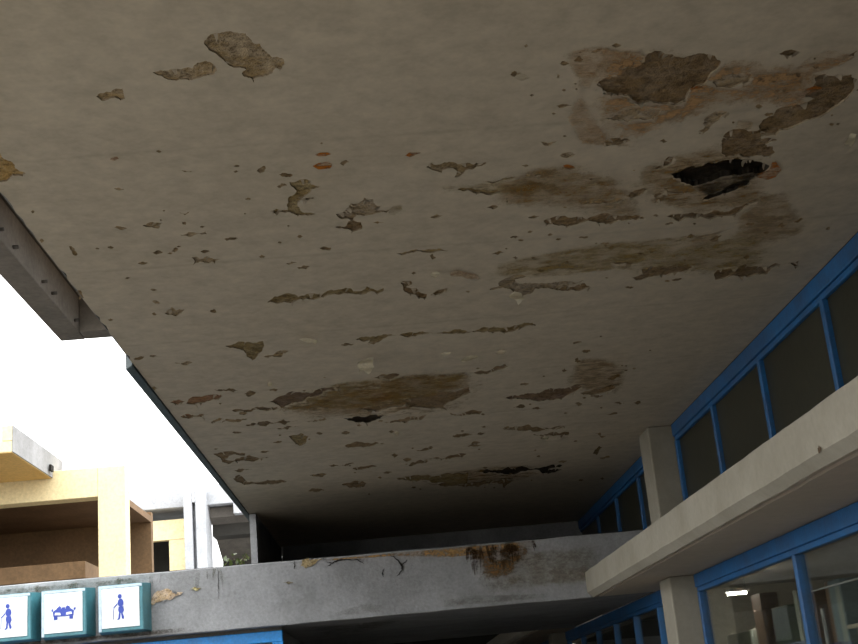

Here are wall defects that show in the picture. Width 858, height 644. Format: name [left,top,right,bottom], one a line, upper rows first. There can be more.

peeling [155,31,284,82]
peeling [597,51,720,108]
peeling [700,58,858,176]
peeling [0,154,24,181]
water stain [501,152,798,275]
peeling [270,287,384,305]
peeling [172,377,341,445]
water stain [288,374,464,414]
peeling [342,387,485,447]
peeling [215,448,286,484]
peeling [379,426,511,490]
crack [382,556,407,577]